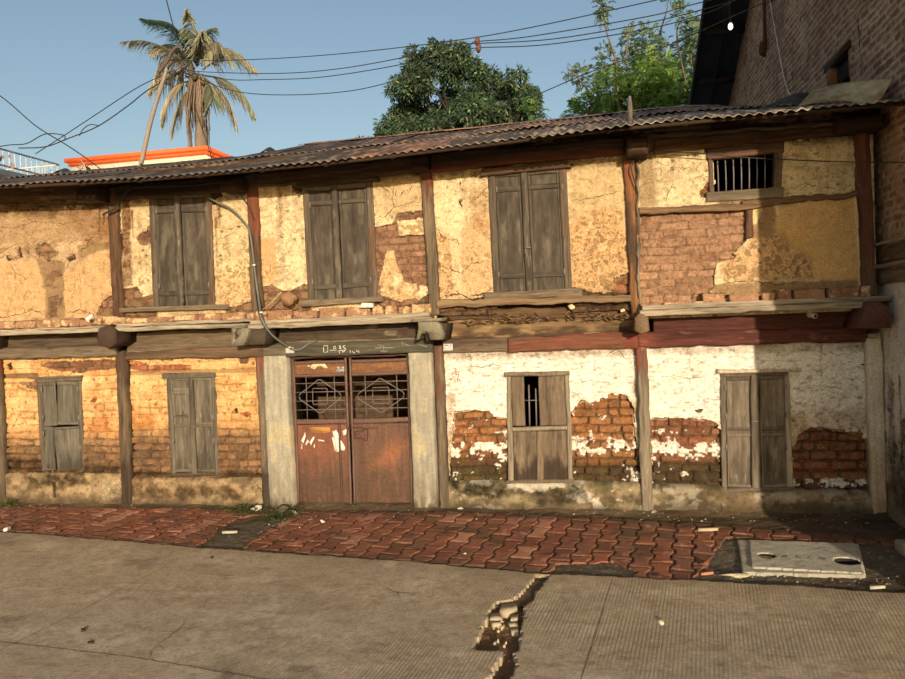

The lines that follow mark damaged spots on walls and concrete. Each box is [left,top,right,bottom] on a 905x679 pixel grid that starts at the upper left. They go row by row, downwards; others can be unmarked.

flaking render [6,241,76,319]
flaking render [375,209,429,307]
flaking render [423,296,498,318]
flaking render [568,211,746,318]
flaking render [41,359,116,375]
flaking render [130,361,192,373]
water stain [8,458,120,497]
water stain [134,470,262,499]
flaking render [449,410,508,481]
flaking render [571,391,641,482]
flaking render [650,409,721,485]
flaking render [787,423,867,490]